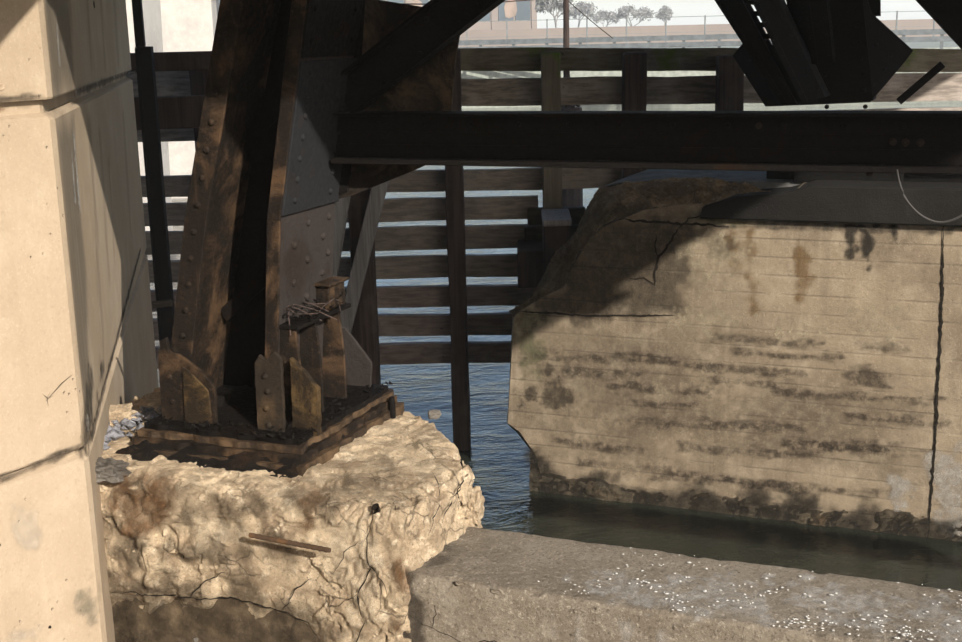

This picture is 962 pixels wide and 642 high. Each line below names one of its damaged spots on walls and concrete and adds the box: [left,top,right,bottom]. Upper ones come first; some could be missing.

spalling [509,177,770,317]
crack [619,216,729,286]
water stain [815,224,897,270]
crack [517,310,675,318]
water stain [521,366,573,409]
water stain [710,364,810,396]
water stain [847,369,892,400]
crack [928,226,944,520]
crack [428,449,464,559]
water stain [525,449,962,542]
crack [113,572,319,642]
crack [330,511,387,642]